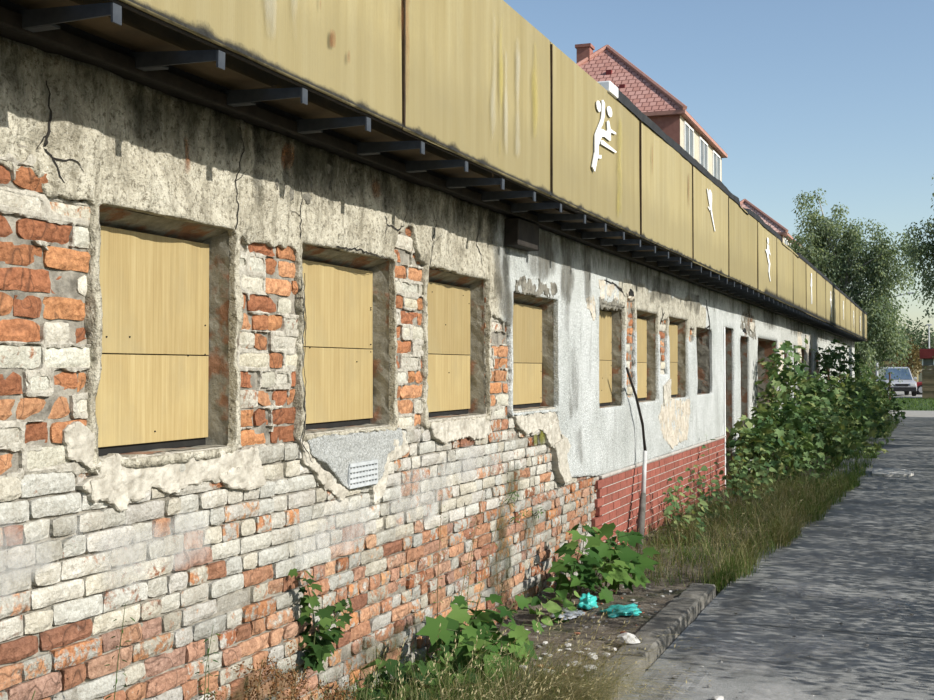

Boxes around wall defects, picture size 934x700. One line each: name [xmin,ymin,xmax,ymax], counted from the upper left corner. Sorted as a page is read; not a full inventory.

crack [37,80,83,183]
crack [235,127,246,229]
spalling [513,275,558,301]
peeling [60,421,267,512]
peeling [293,428,409,504]
peeling [429,417,492,444]
peeling [512,412,572,483]
spalling [658,379,691,450]